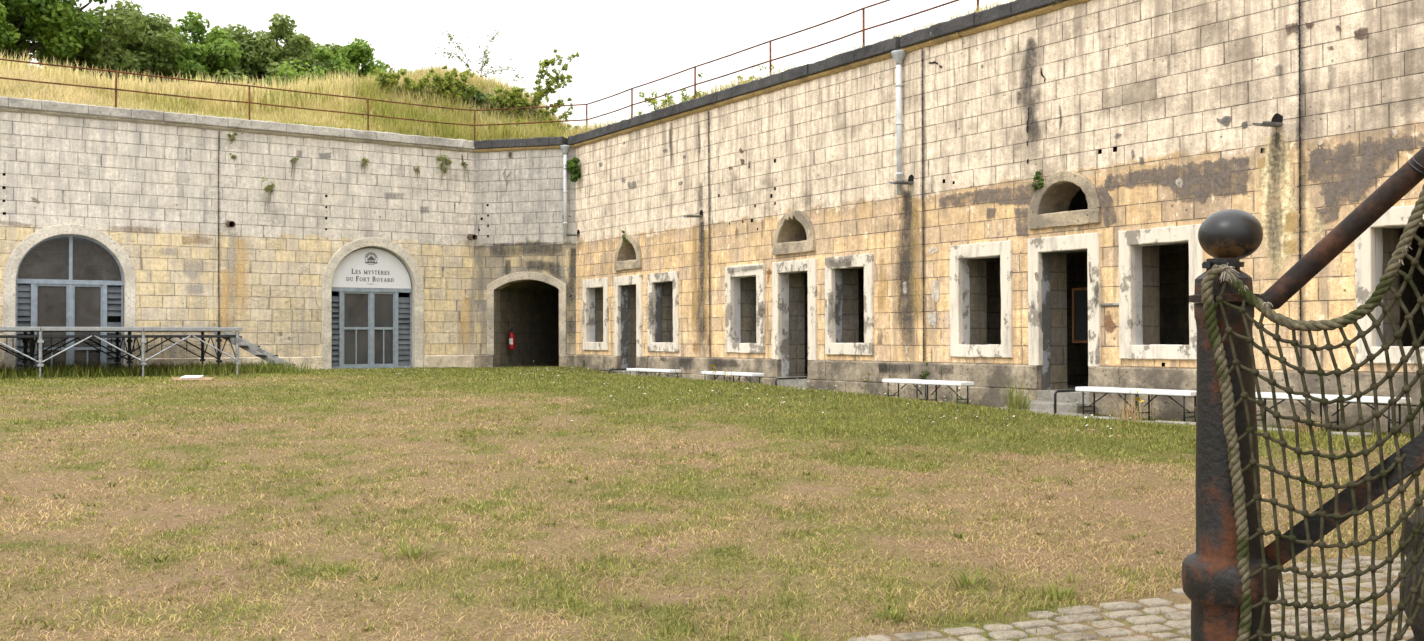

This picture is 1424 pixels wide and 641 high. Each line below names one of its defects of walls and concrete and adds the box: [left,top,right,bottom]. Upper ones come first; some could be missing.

damp [1017,39,1038,140]
damp [1260,134,1322,275]